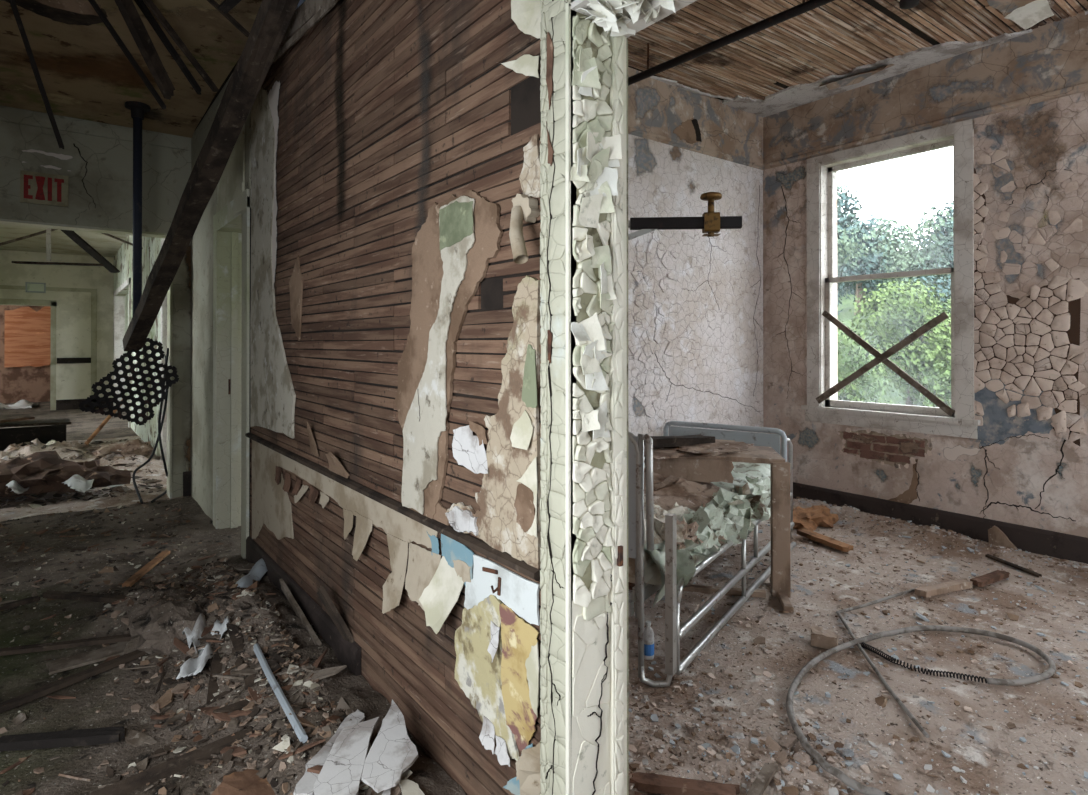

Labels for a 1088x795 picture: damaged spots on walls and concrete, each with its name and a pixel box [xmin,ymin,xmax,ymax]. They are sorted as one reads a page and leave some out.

flaking render [650,0,1054,118]
flaking render [670,118,702,161]
peeling [776,166,807,190]
crack [654,185,802,412]
peeling [838,150,1088,504]
peeling [250,0,678,795]
peeling [798,428,819,449]
crack [979,429,1075,521]